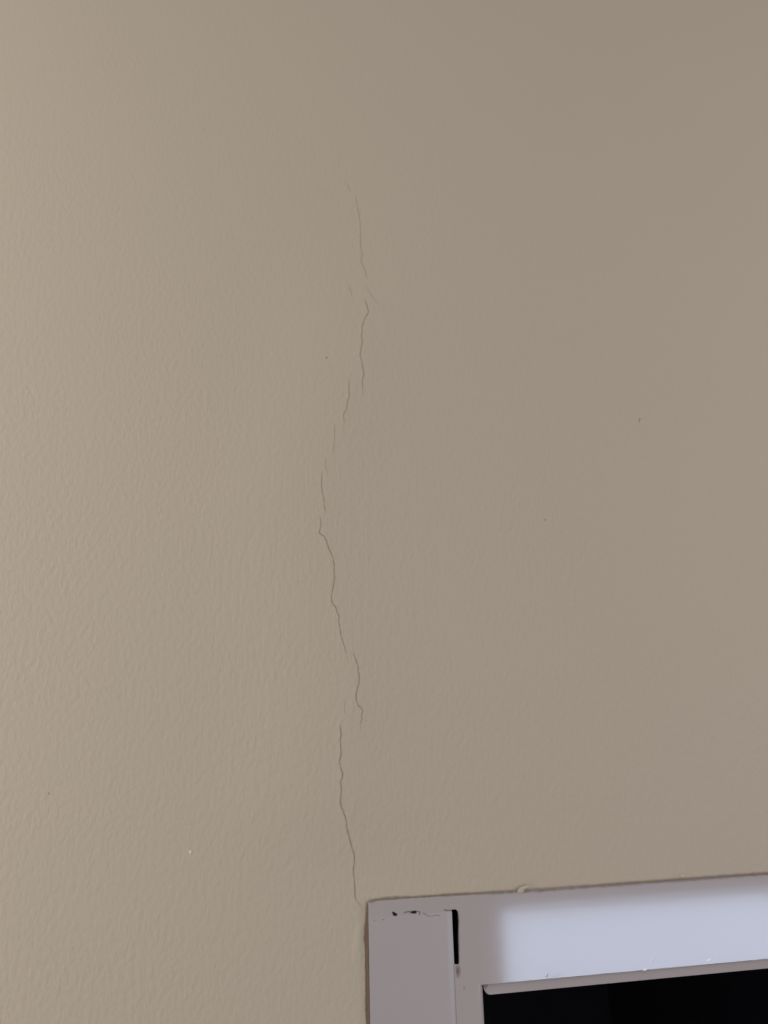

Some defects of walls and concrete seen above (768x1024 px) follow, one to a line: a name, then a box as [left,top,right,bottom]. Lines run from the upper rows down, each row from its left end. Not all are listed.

crack [315,193,381,1024]